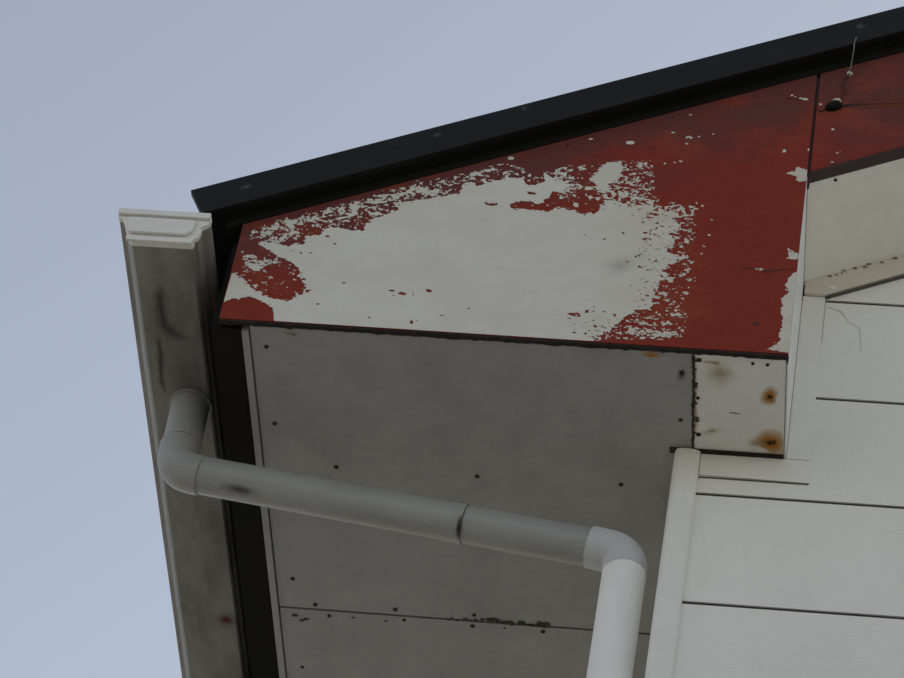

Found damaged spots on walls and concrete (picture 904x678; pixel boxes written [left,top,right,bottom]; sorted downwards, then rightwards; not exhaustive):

peeling [787,167,807,182]
peeling [224,156,710,341]
peeling [769,272,797,353]
corrosion [763,390,776,403]
corrosion [753,434,783,453]